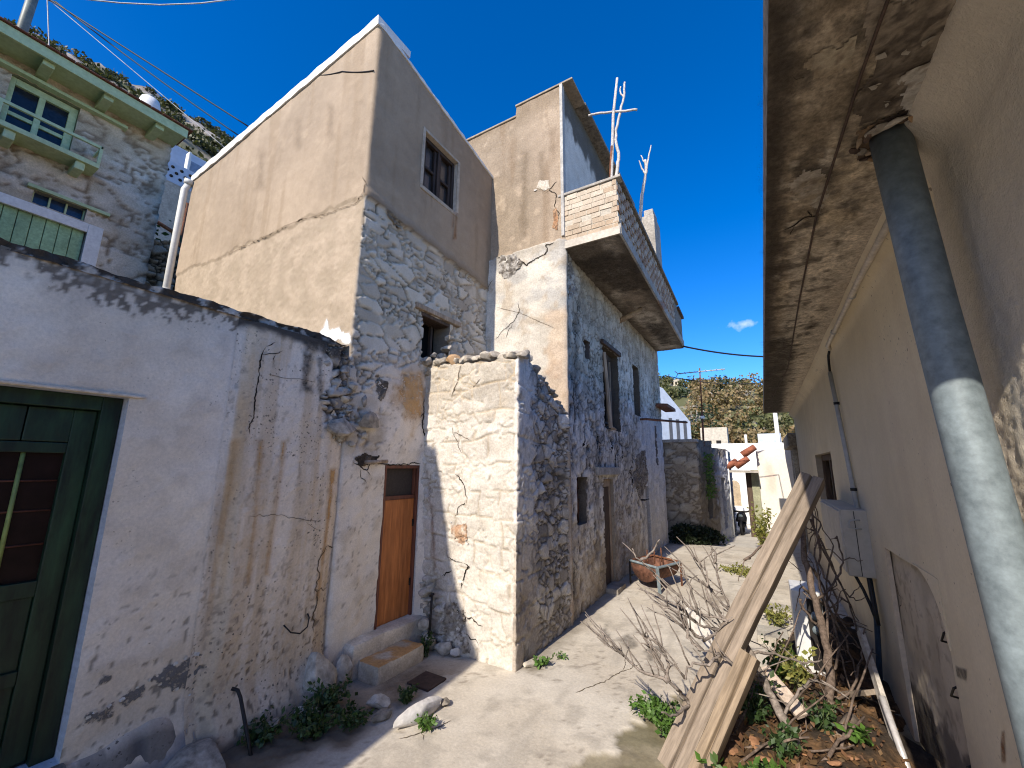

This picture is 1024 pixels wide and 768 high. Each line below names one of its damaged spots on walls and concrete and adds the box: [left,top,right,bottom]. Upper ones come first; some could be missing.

peeling [803,0,956,162]
crack [239,177,366,250]
crack [488,243,553,287]
crack [497,305,551,338]
crack [248,342,313,434]
leakage [767,337,796,412]
crack [251,514,333,632]
crack [442,429,483,643]
peeling [85,652,202,723]